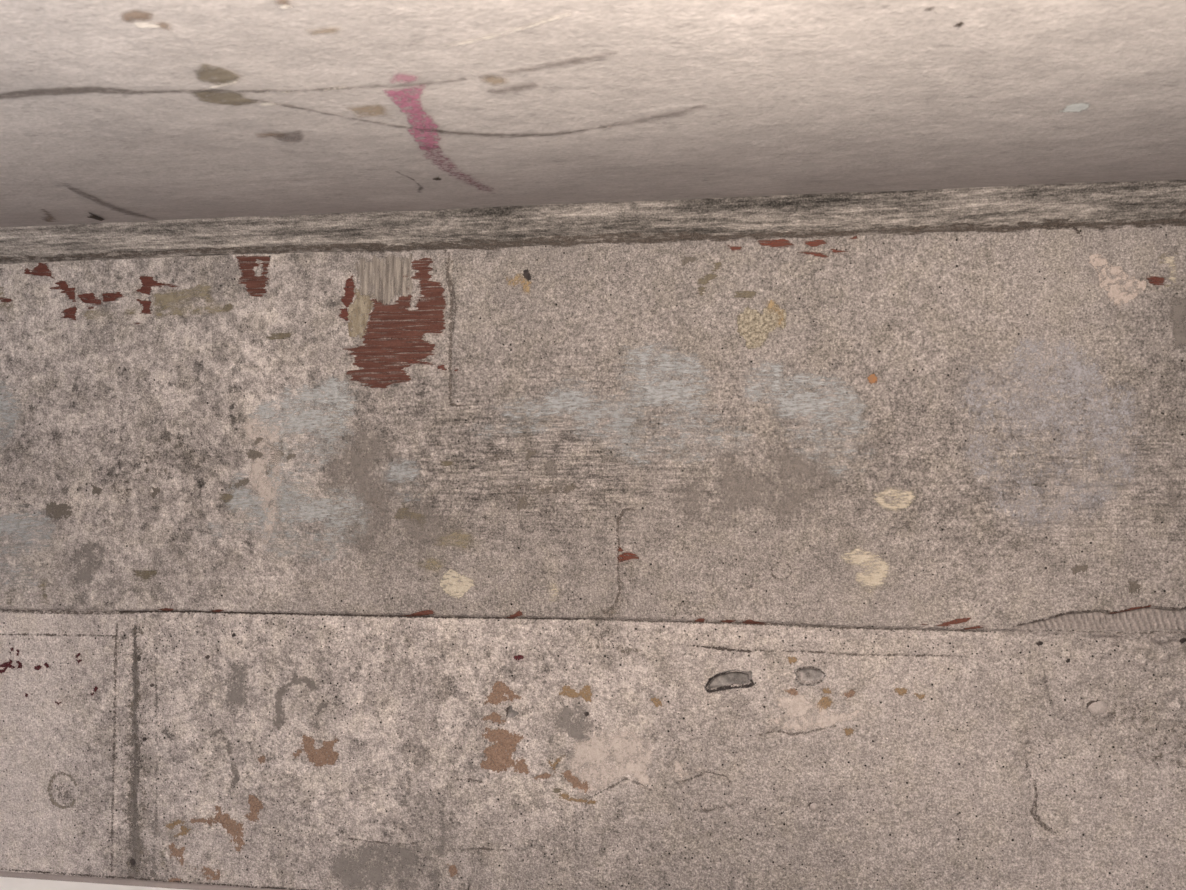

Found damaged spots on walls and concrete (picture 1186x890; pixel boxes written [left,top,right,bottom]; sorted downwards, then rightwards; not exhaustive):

peeling [24,263,178,324]
peeling [338,253,458,388]
crack [1,508,988,890]
crack [1025,762,1056,835]